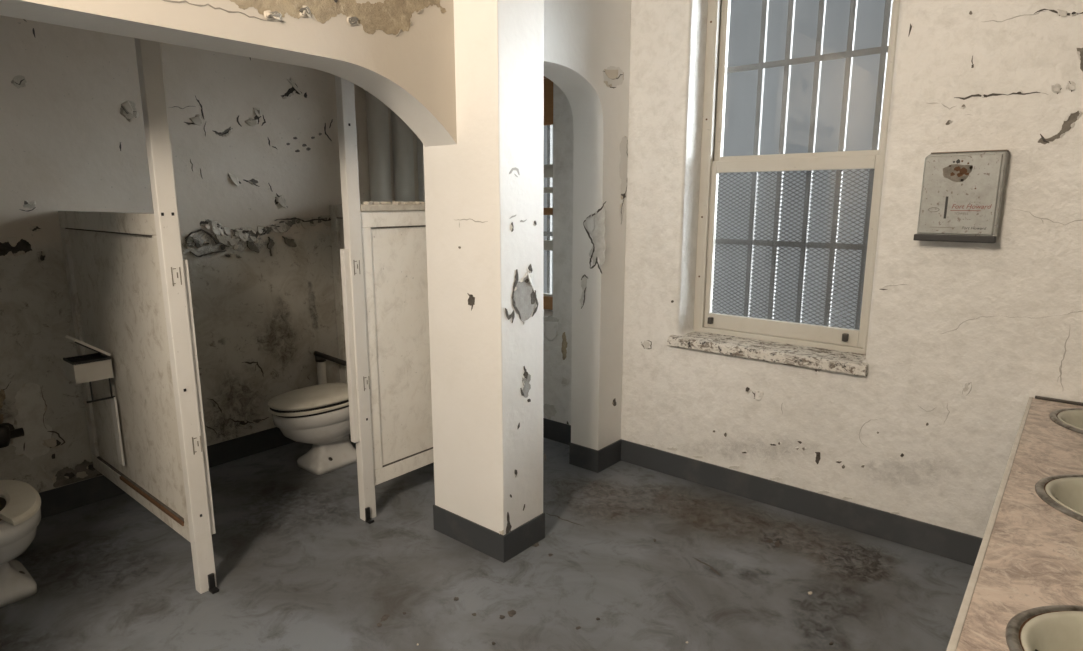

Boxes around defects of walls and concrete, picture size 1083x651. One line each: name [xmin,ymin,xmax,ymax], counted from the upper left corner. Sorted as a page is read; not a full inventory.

spalling [230,0,446,36]
crack [985,9,1083,22]
peeling [170,96,266,137]
peeling [281,78,308,99]
peeling [268,119,333,152]
crack [928,90,1048,110]
peeling [619,136,628,224]
peeling [183,173,331,259]
peeling [0,226,45,261]
peeling [579,201,606,309]
peeling [505,264,568,360]
damp [0,383,52,461]